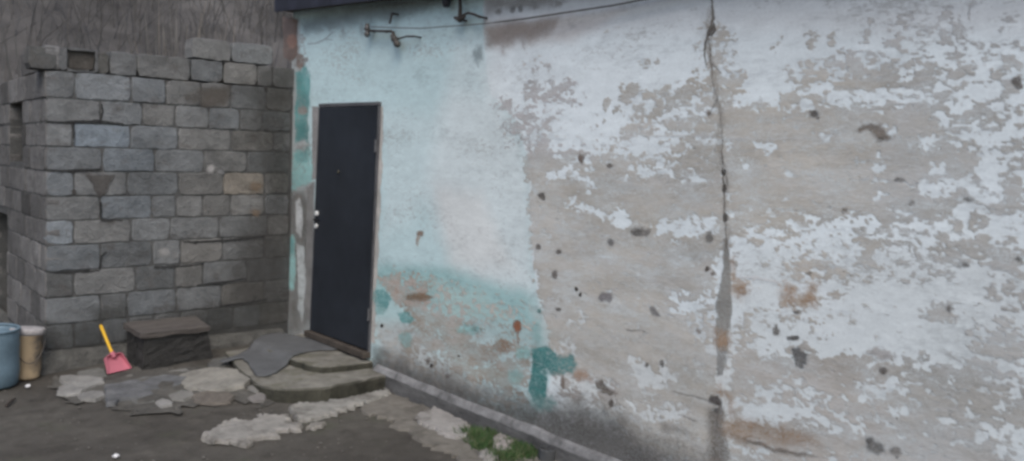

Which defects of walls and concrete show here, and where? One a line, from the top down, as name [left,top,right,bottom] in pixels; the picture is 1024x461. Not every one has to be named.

crack [703,0,733,254]
peeling [489,0,1024,461]
peeling [373,265,459,349]
rust [491,320,522,355]
damp [367,334,749,461]